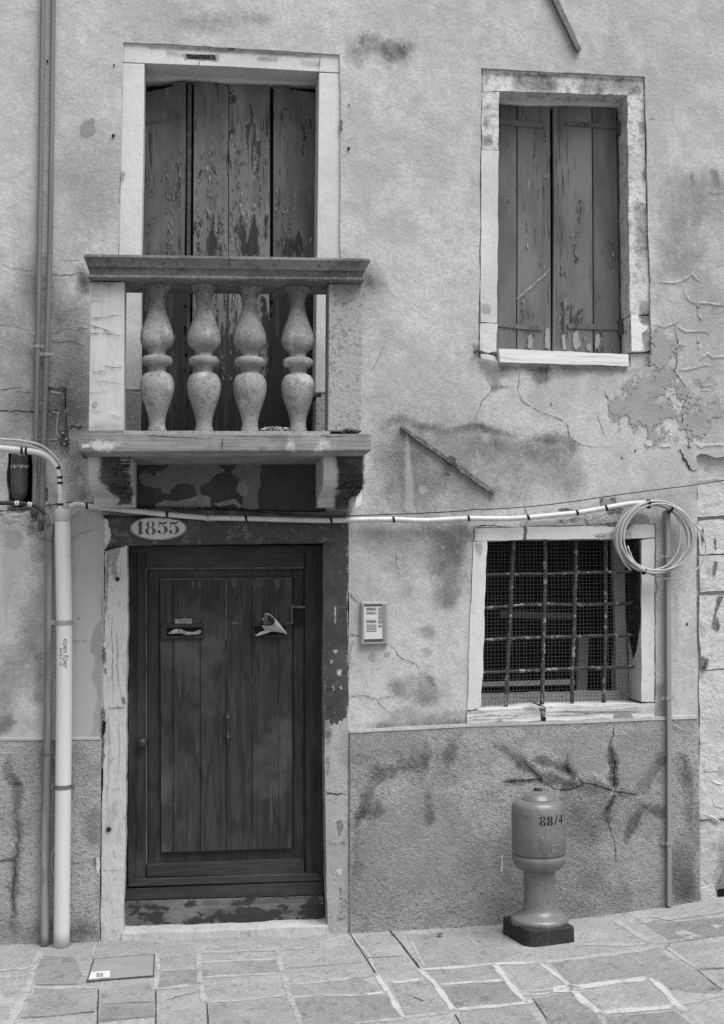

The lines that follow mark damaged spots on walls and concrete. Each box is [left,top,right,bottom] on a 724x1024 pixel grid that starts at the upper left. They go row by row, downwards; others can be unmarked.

crack [475,366,612,448]
peeling [608,315,724,449]
peeling [138,464,261,510]
crack [469,524,658,862]